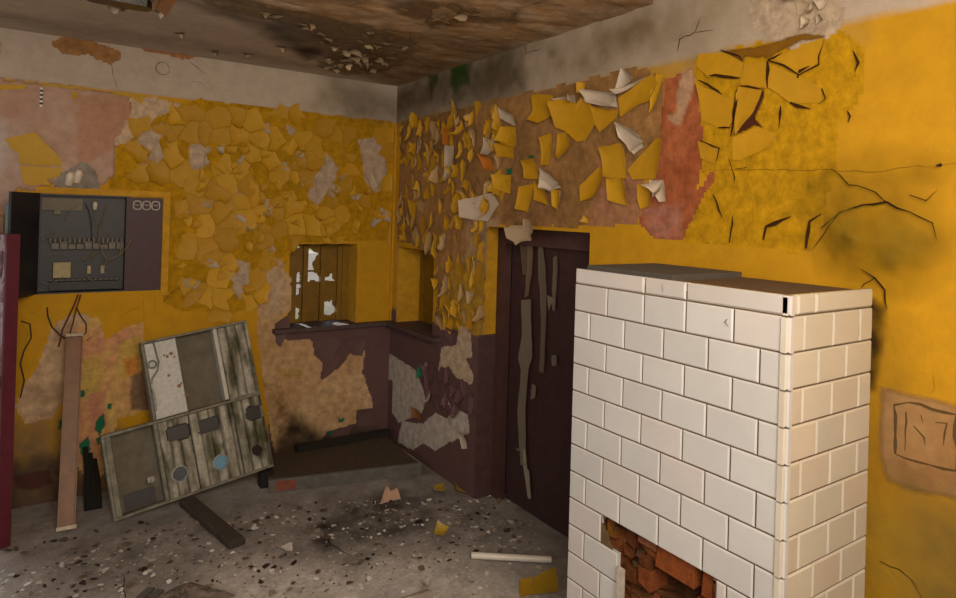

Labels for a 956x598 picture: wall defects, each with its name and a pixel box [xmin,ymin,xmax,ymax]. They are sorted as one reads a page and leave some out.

peeling [394,1,515,29]
peeling [750,0,845,50]
spalling [52,37,121,65]
crack [677,19,956,255]
peeling [0,66,715,477]